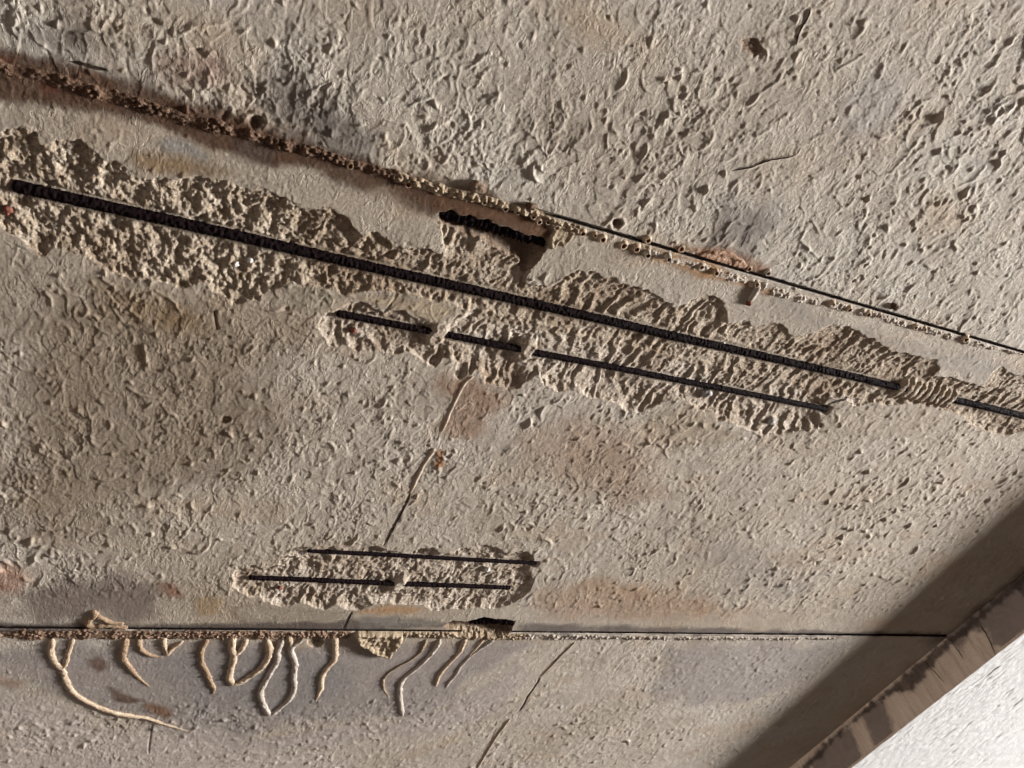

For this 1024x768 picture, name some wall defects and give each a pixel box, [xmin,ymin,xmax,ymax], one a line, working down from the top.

rust [0,50,552,239]
spalling [0,127,1024,436]
rust [651,249,765,279]
crack [384,376,474,546]
spalling [232,545,537,633]
water stain [0,582,919,768]
crack [477,642,575,768]